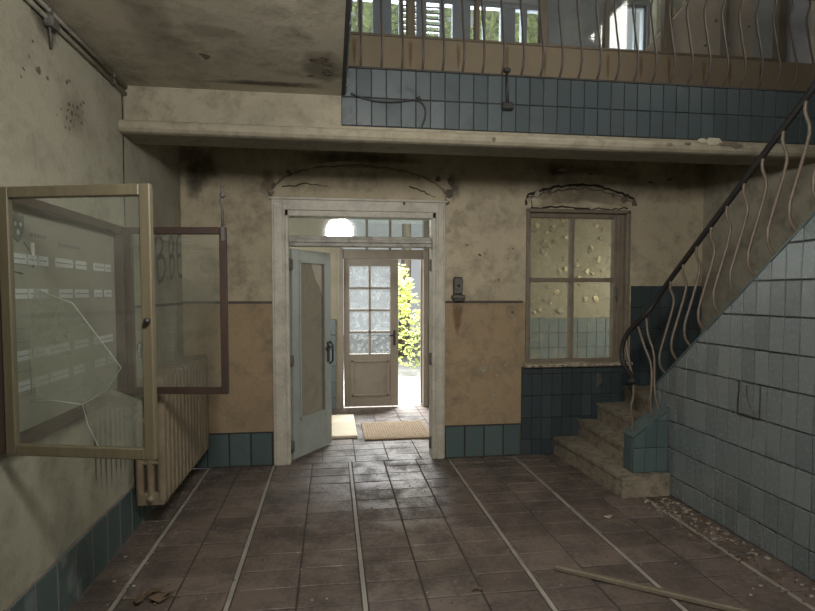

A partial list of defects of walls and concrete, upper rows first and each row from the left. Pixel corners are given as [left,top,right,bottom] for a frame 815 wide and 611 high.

crack [525,183,637,210]